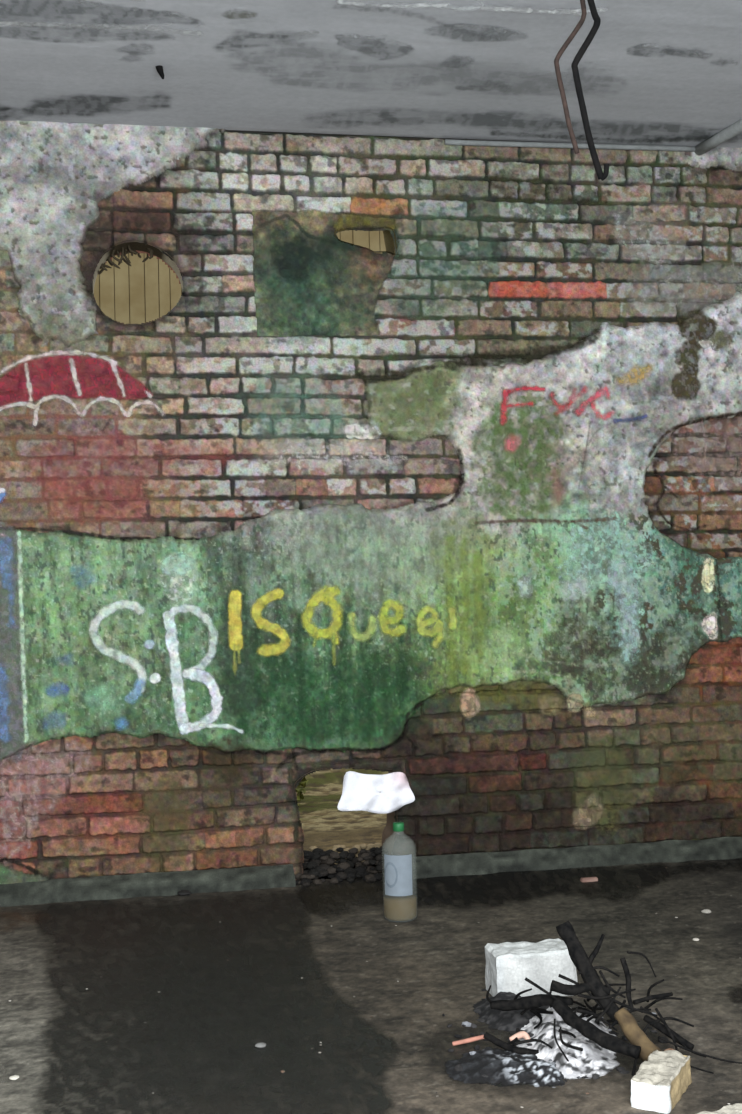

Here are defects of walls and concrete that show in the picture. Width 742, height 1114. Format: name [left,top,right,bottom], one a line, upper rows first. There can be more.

water stain [0,96,126,117]
water stain [447,114,573,128]
water stain [602,124,710,141]
flaking render [0,128,742,546]
flaking render [640,408,742,592]
peeling [560,512,653,661]
flaking render [0,617,742,882]